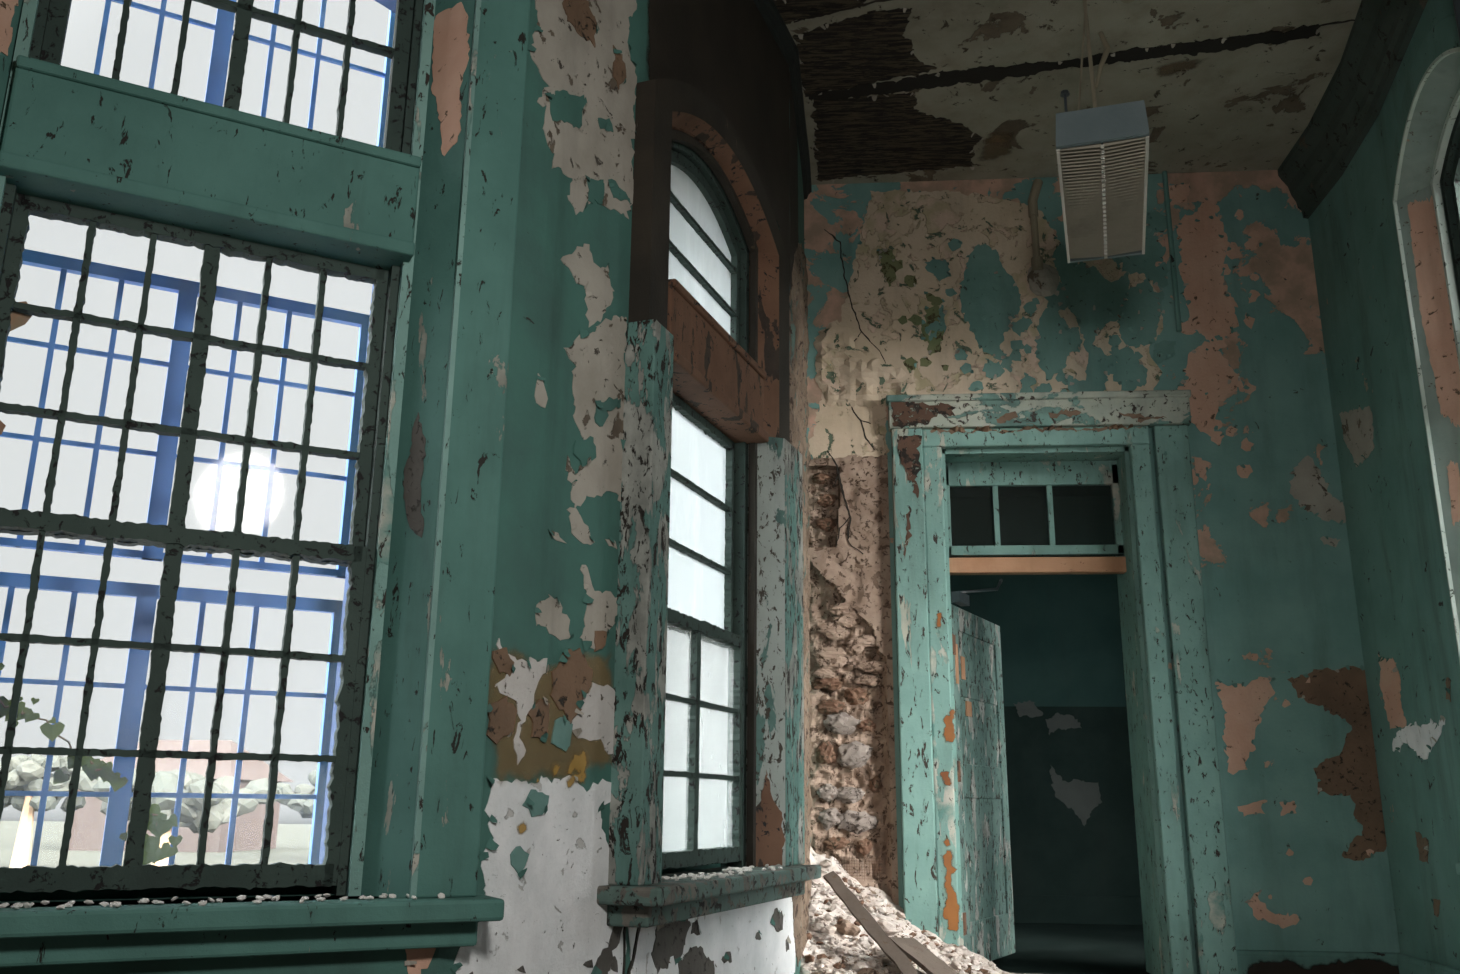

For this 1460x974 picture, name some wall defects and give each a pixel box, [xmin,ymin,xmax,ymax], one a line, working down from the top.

peeling [528,0,637,219]
peeling [830,183,1263,478]
peeling [403,413,426,538]
peeling [1192,457,1212,485]
spalling [451,243,912,974]
peeling [955,644,966,684]
peeling [1013,700,1081,735]
peeling [1049,766,1102,826]
spalling [1214,654,1451,863]
peeling [405,948,436,974]